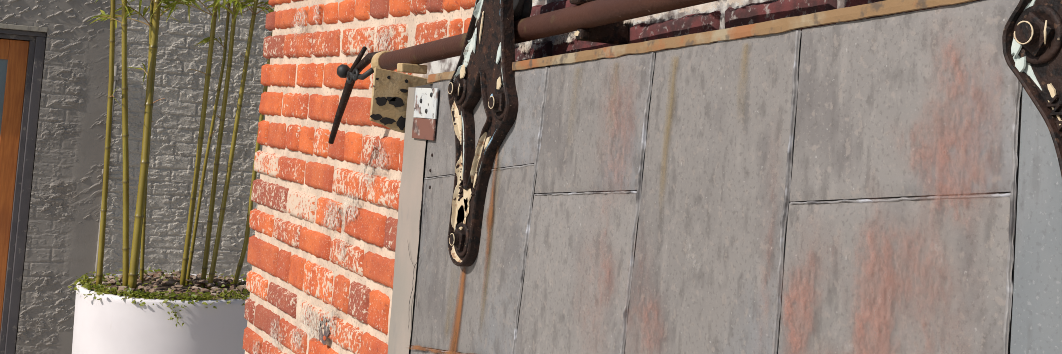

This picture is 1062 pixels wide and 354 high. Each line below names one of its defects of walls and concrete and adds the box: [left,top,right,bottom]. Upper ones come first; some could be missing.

rust [411,268,474,354]